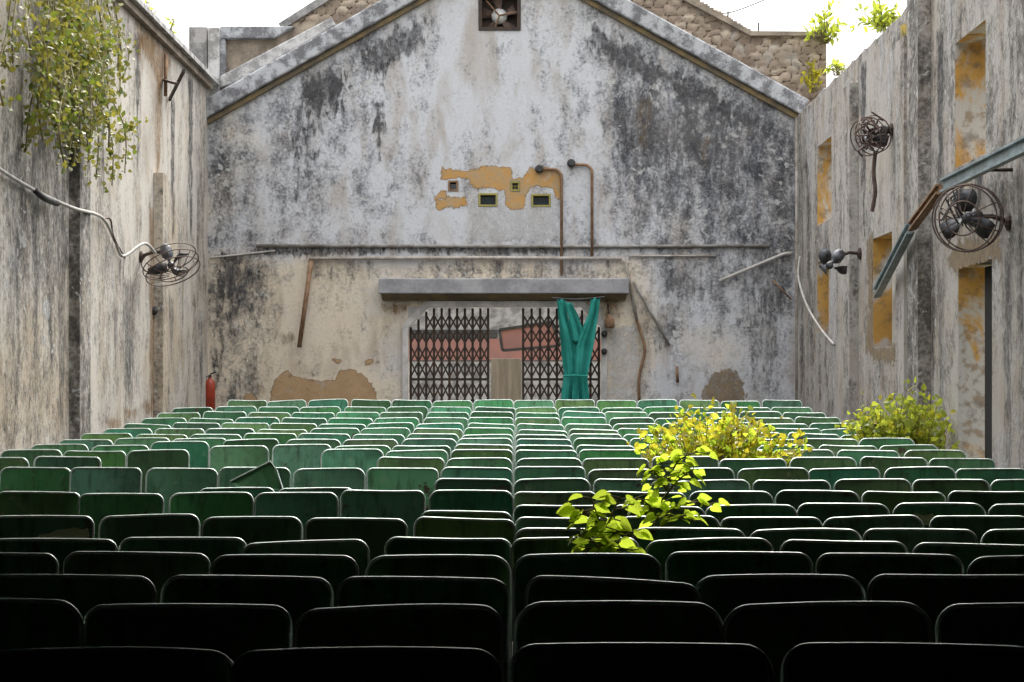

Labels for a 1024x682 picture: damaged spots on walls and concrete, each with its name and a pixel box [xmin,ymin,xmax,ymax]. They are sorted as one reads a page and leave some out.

water stain [361,17,433,86]
water stain [373,102,386,160]
water stain [586,22,777,201]
water stain [937,0,954,184]
peeling [434,165,560,243]
water stain [209,247,565,396]
water stain [1002,233,1023,418]
peeling [243,358,379,407]
peeling [671,347,764,404]